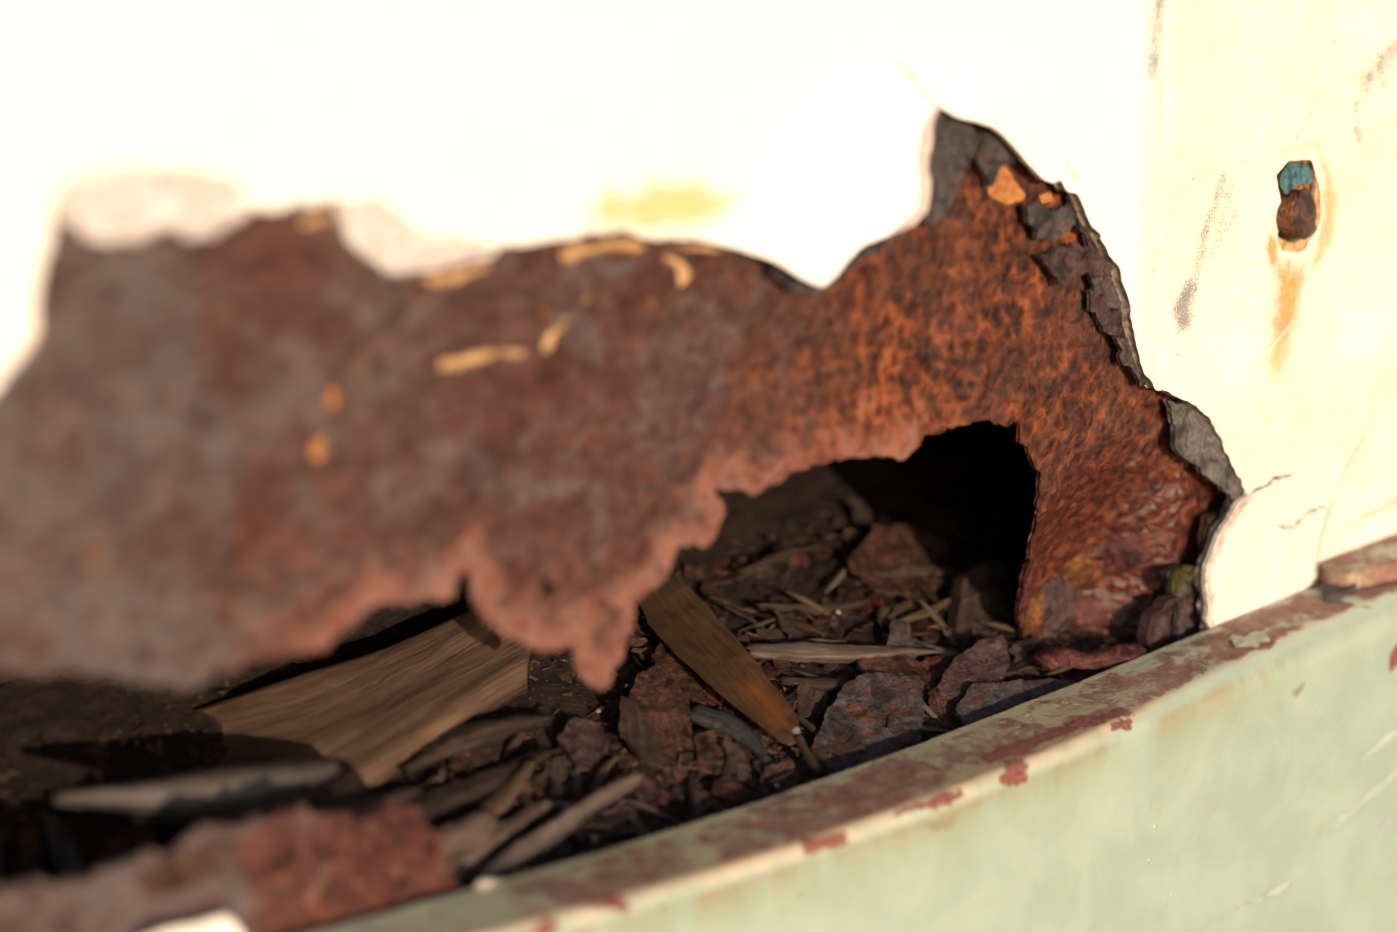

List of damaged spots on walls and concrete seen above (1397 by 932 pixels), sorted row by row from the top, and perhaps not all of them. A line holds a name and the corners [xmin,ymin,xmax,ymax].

peeling [52,163,251,243]
peeling [325,196,498,274]
peeling [767,230,902,294]
corrosion [1269,237,1300,362]
corrosion [0,110,1227,786]
peeling [1160,399,1270,648]
crack [1251,474,1293,495]
crack [1278,434,1366,570]
corrosion [896,790,964,815]
corrosion [0,799,459,932]
corrosion [800,832,848,855]
peeling [156,914,241,932]